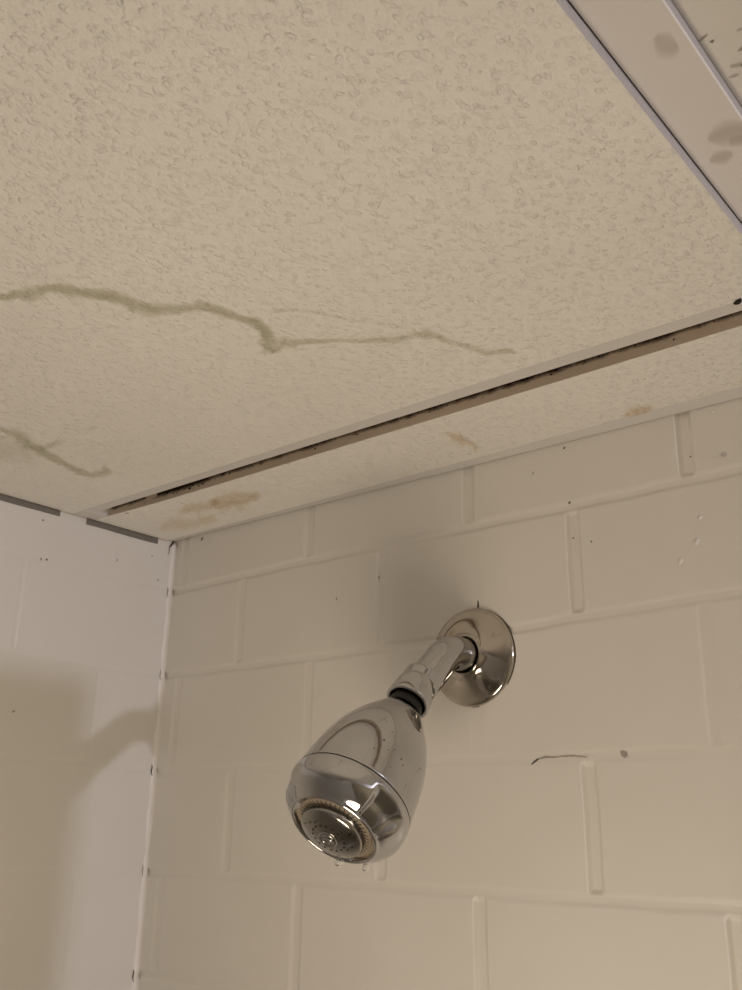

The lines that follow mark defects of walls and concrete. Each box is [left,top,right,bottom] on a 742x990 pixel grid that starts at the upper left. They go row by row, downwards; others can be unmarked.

leakage [112,311,742,509]